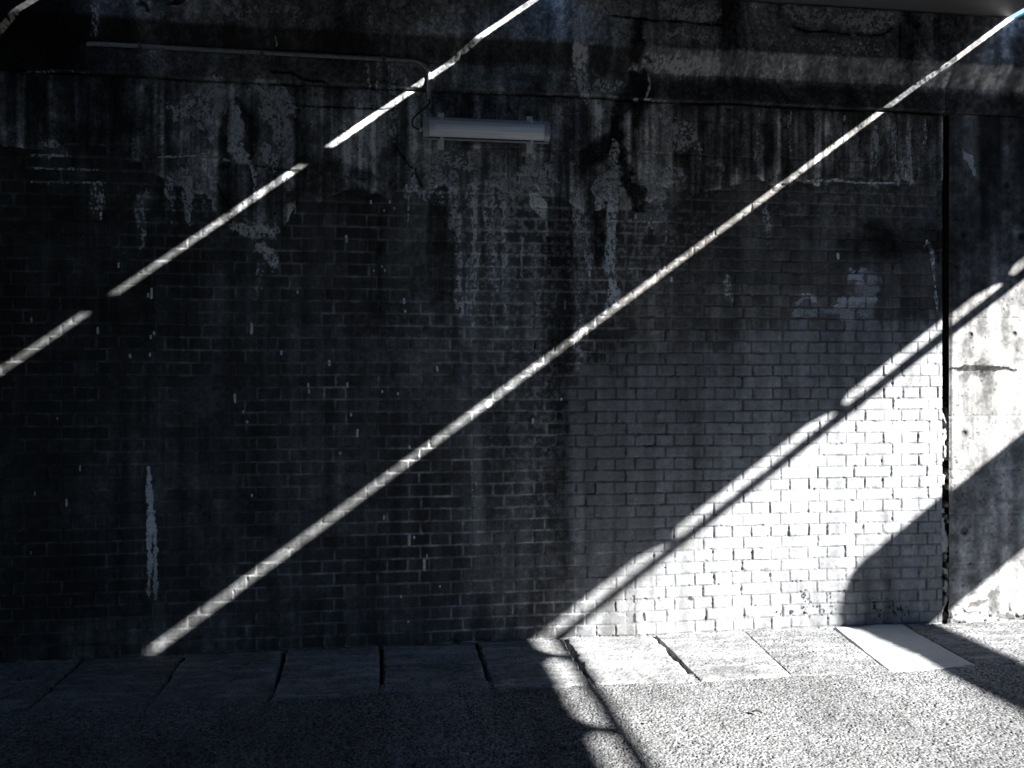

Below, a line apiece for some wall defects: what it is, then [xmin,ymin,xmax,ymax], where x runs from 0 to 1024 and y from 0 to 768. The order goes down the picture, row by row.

water stain [403,1,703,374]
water stain [807,118,928,186]
water stain [146,466,159,590]